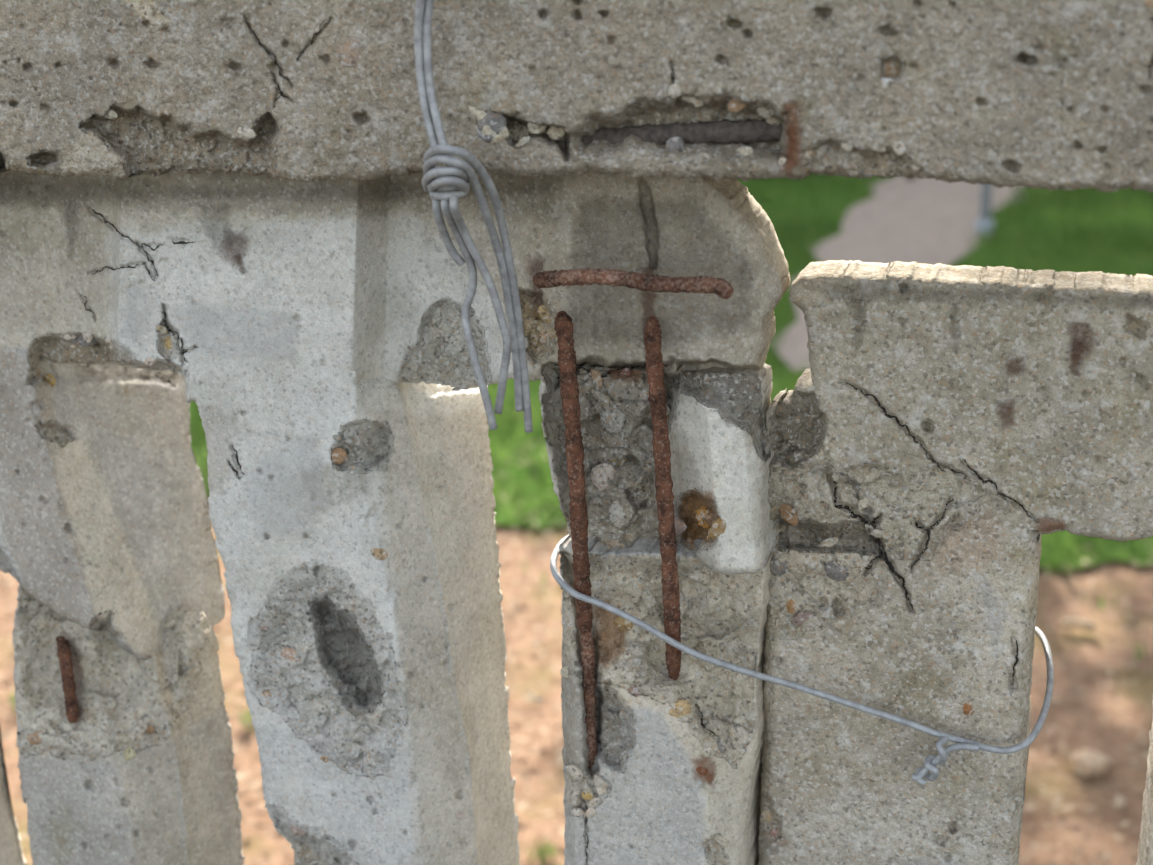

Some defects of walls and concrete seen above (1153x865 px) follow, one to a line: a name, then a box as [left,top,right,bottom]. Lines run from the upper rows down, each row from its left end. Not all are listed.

crack [243,17,324,101]
spalling [469,84,928,178]
rust [785,104,800,173]
crack [81,207,193,317]
crack [163,308,197,363]
rust [681,493,715,540]
spalling [511,268,1008,820]
crack [832,383,1038,610]
spalling [0,545,211,761]
spalling [247,558,409,780]
rust [597,602,624,665]
rust [696,757,714,783]